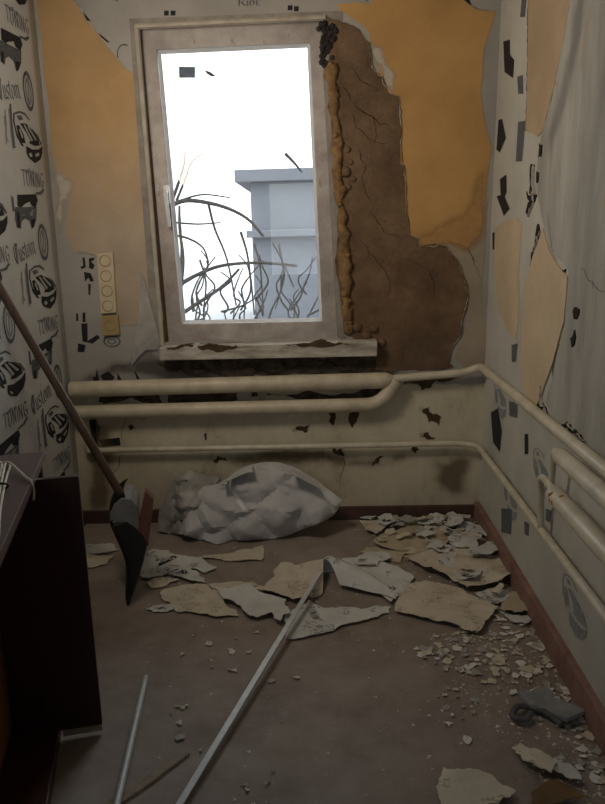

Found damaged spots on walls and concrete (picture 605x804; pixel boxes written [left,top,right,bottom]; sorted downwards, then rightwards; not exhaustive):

flaking render [443,198,489,368]
flaking render [158,339,378,377]
spalling [404,373,458,390]
flaking render [99,389,382,404]
spalling [348,412,359,428]
spalling [419,406,441,426]
leakage [441,460,466,490]